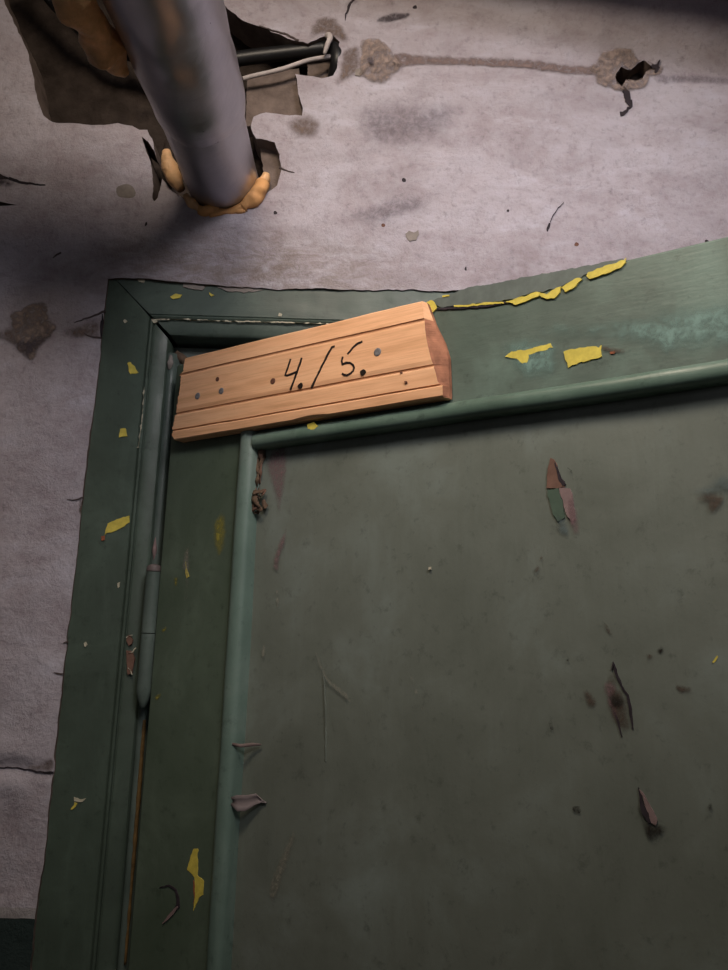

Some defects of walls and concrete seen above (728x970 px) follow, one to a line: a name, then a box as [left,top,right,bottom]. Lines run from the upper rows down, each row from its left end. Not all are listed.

spalling [230,31,252,51]
spalling [9,0,190,199]
spalling [239,59,330,193]
spalling [0,176,45,186]
peeling [427,258,627,312]
peeling [615,308,728,347]
peeling [505,343,553,373]
peeling [564,345,621,368]
spalling [546,458,577,533]
spalling [606,662,633,737]
peeling [231,794,267,812]
peeling [187,849,204,911]